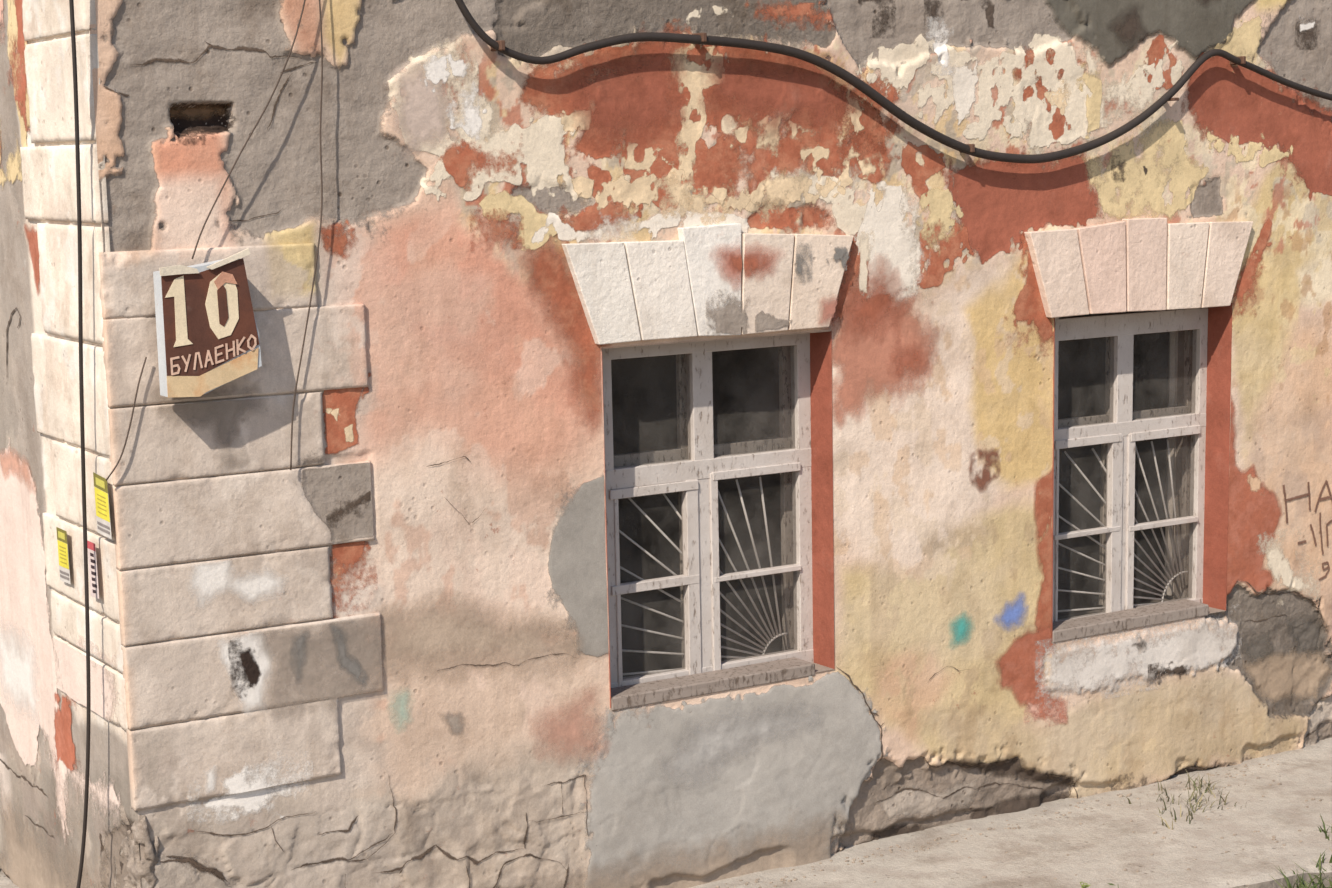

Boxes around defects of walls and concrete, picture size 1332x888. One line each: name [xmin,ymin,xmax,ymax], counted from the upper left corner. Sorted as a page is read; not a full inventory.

peeling [0,0,30,186]
crack [6,307,21,367]
peeling [25,226,40,292]
flaking render [99,0,1332,423]
flaking render [302,373,376,619]
peeling [970,450,1000,490]
peeling [1035,470,1052,632]
flaking render [1206,401,1332,746]
peeling [0,437,231,888]
peeling [1148,662,1187,684]
crack [160,775,589,888]
flaking render [835,756,1074,850]